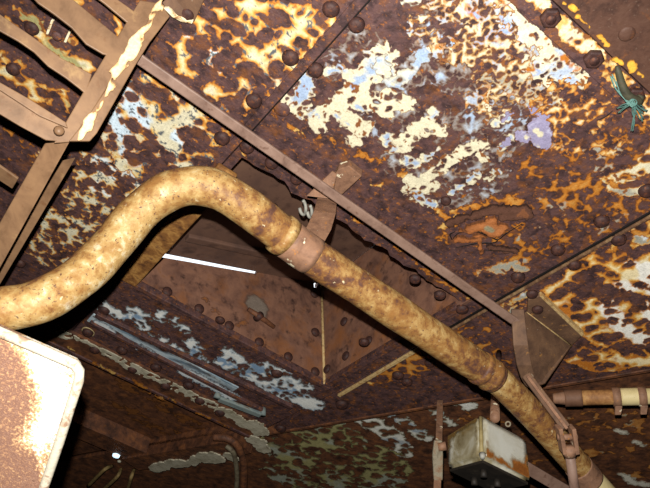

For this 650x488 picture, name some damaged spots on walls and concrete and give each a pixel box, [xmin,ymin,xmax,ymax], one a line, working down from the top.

peeling [21,0,237,267]
rust [315,134,386,171]
peeling [281,0,650,210]
rust [430,126,650,265]
rust [393,244,471,300]
peeling [539,228,650,372]
rust [579,244,619,270]
peeling [95,300,326,411]
rust [367,351,437,388]
peeling [453,402,479,411]
rust [457,325,512,367]
peeling [259,414,434,488]